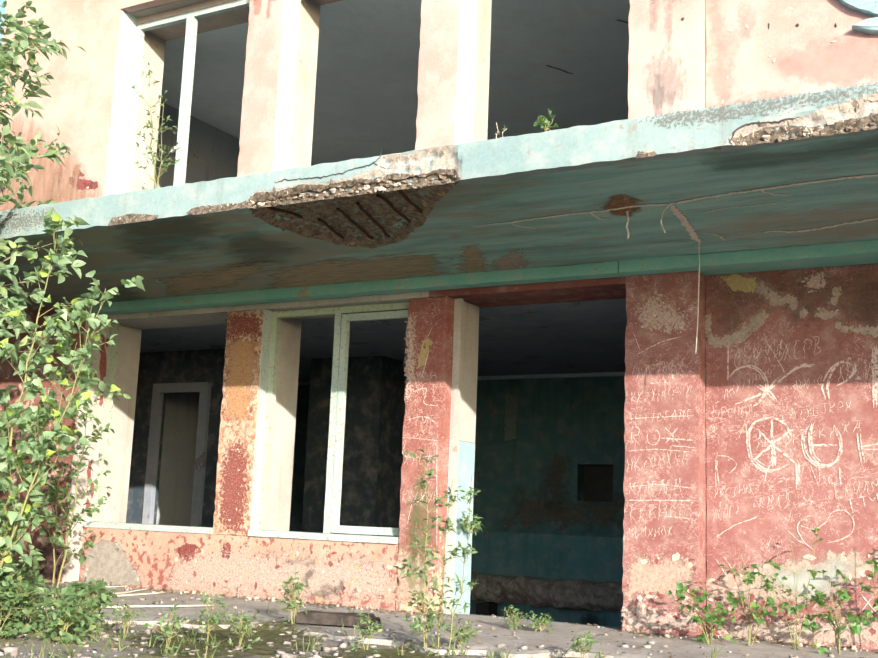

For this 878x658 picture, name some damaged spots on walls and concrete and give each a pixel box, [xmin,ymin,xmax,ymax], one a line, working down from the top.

spalling [729,91,878,146]
peeling [70,170,98,190]
crack [275,147,392,183]
spalling [186,145,528,290]
corrosion [603,195,644,217]
crack [474,174,878,243]
peeling [720,273,759,293]
peeling [801,272,828,293]
peeling [221,313,262,426]
peeling [163,439,438,606]
peeling [621,550,878,648]